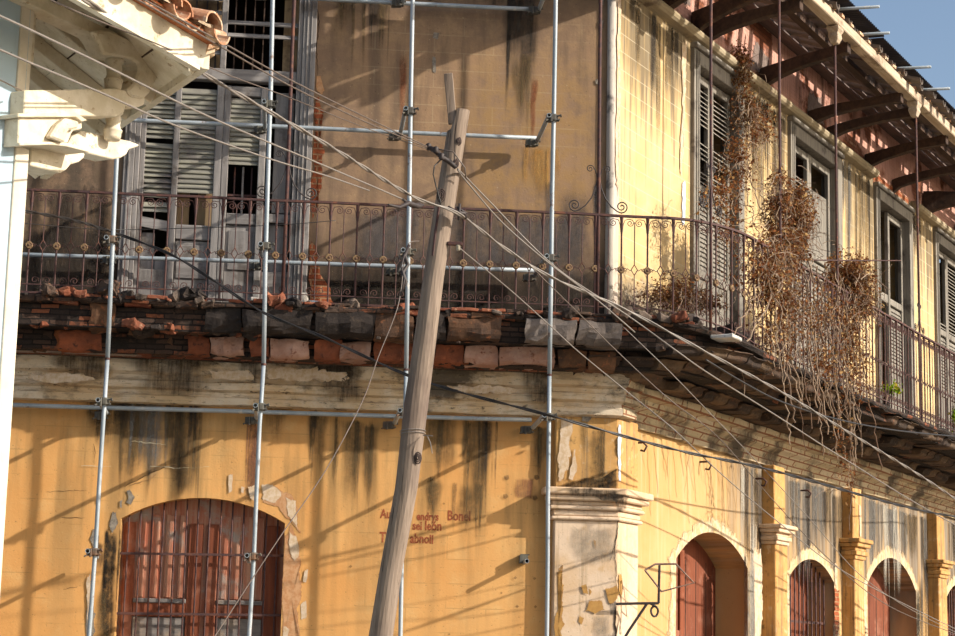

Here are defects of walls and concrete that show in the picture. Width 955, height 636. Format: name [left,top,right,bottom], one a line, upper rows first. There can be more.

water stain [507,0,537,106]
spalling [311,76,325,218]
peeling [267,366,349,382]
water stain [526,372,547,403]
water stain [89,402,202,488]
water stain [310,410,375,491]
water stain [429,420,498,523]
peeling [557,416,592,481]
water stain [98,530,121,636]
peeling [228,474,308,636]
peeling [554,565,565,636]
peeling [578,574,623,625]